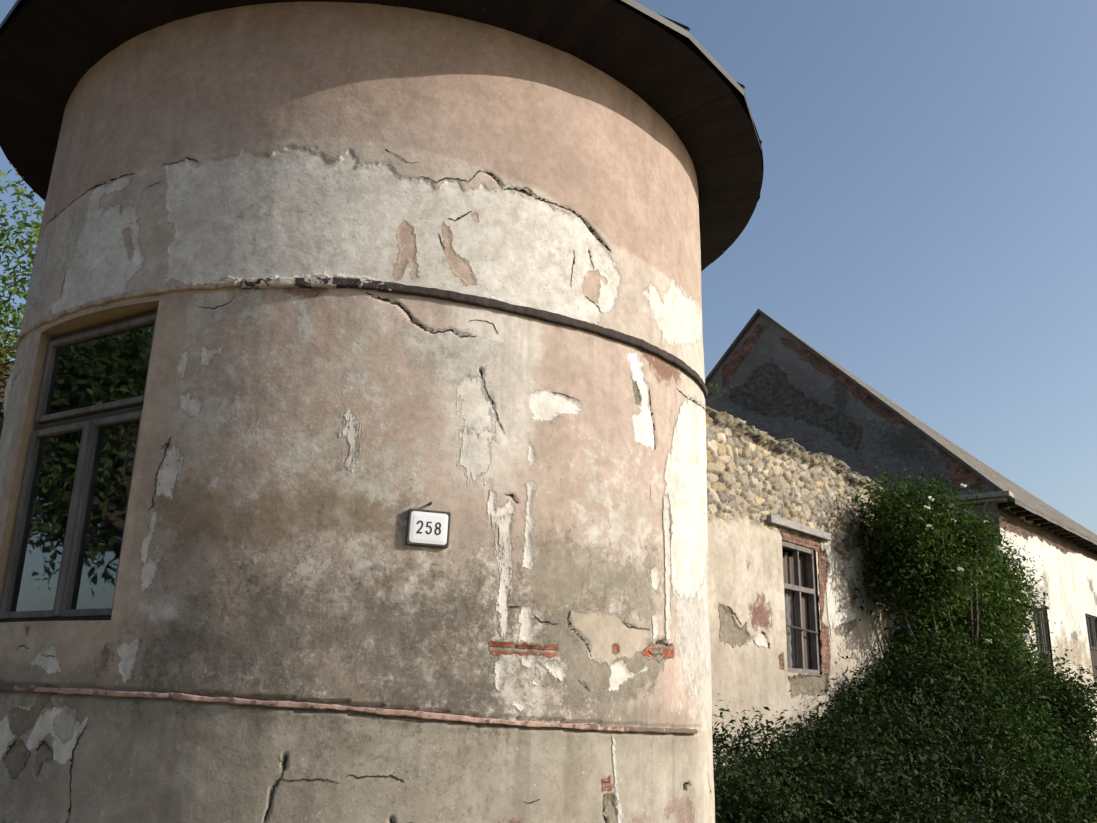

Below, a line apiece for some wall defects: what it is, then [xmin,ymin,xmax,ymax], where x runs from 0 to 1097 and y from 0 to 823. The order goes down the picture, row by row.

peeling [50,175,145,315]
crack [42,157,199,236]
peeling [164,144,621,325]
peeling [642,277,699,349]
flaking render [721,323,863,450]
peeling [117,444,184,684]
peeling [392,315,708,710]
peeling [718,603,753,648]
peeling [0,646,90,779]
crack [57,718,89,823]
crack [264,755,404,823]
flaking render [602,735,625,823]